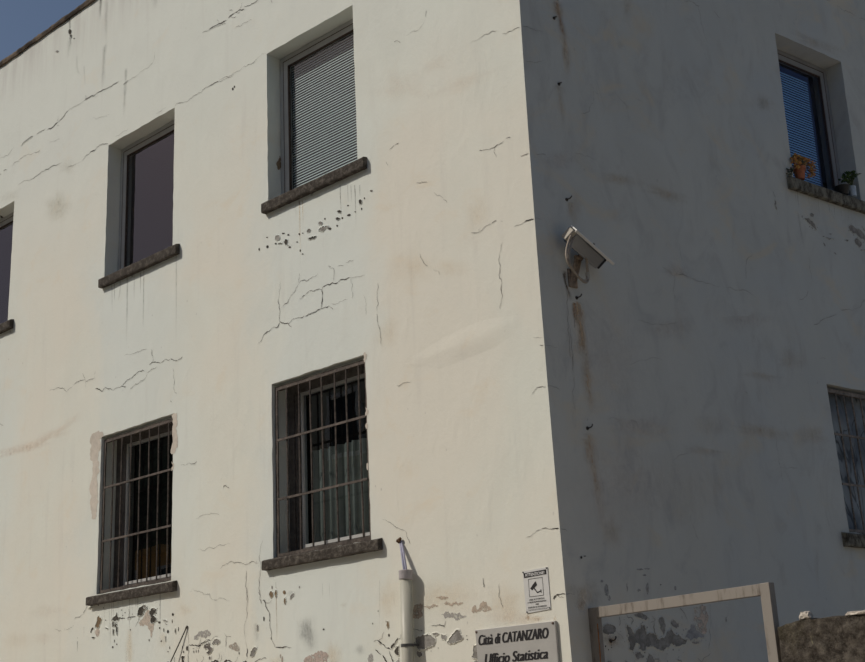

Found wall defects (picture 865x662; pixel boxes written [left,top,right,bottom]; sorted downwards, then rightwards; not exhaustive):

spalling [88,605,123,648]
spalling [130,603,179,652]
peeling [181,630,239,662]